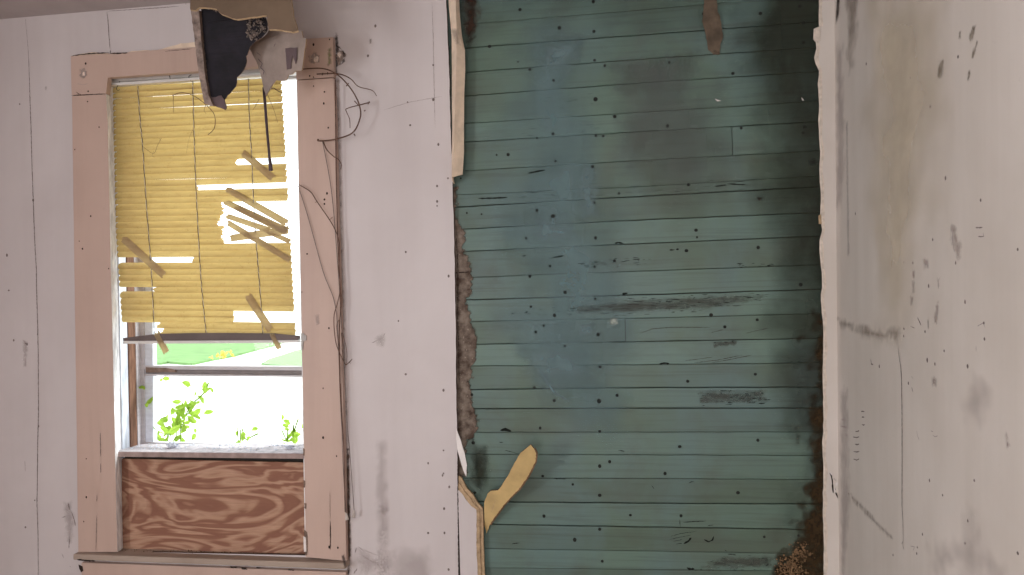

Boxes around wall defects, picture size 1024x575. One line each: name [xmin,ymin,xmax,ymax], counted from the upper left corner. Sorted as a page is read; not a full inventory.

spalling [245,17,266,41]
peeling [702,0,723,55]
peeling [285,47,297,69]
peeling [448,0,465,184]
peeling [600,293,768,316]
peeling [456,429,467,475]